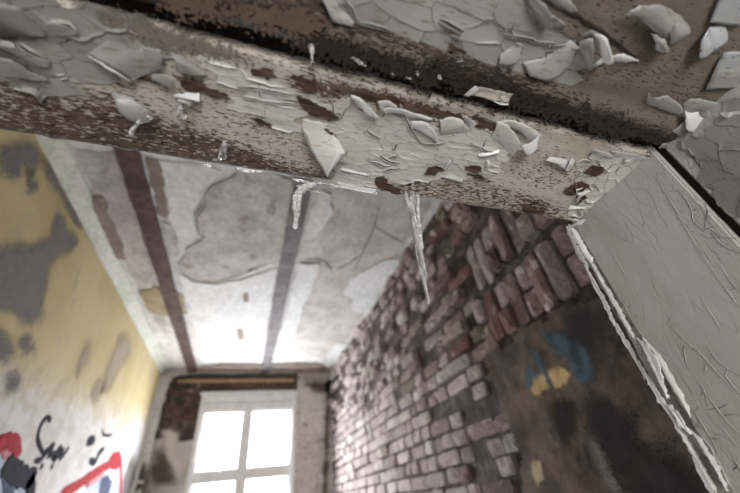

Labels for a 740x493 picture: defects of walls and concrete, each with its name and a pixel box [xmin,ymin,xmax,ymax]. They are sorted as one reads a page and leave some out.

peeling [322,0,639,86]
peeling [0,0,541,372]
peeling [646,93,740,217]
crack [648,149,740,308]
leakage [583,435,624,493]
crack [666,315,740,493]